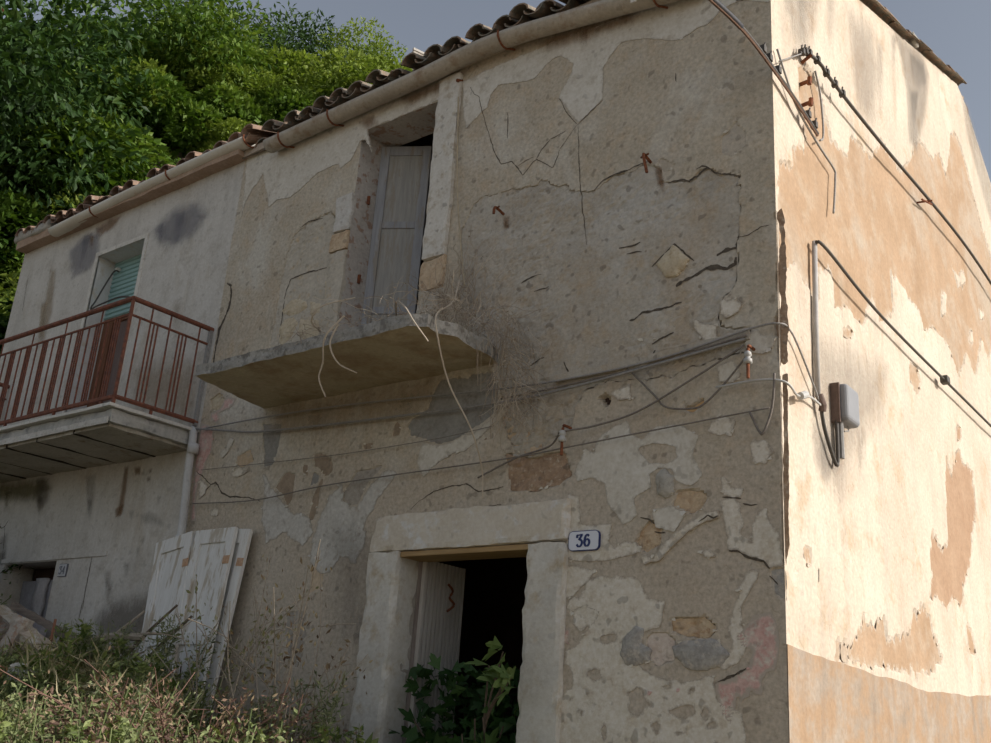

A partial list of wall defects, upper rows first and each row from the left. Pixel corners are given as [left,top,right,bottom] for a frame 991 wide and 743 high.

peeling [241,79,443,217]
crack [471,89,648,244]
damp [73,236,97,271]
spalling [270,212,335,348]
spalling [392,64,991,743]
damp [0,481,47,505]
peeling [261,424,397,574]